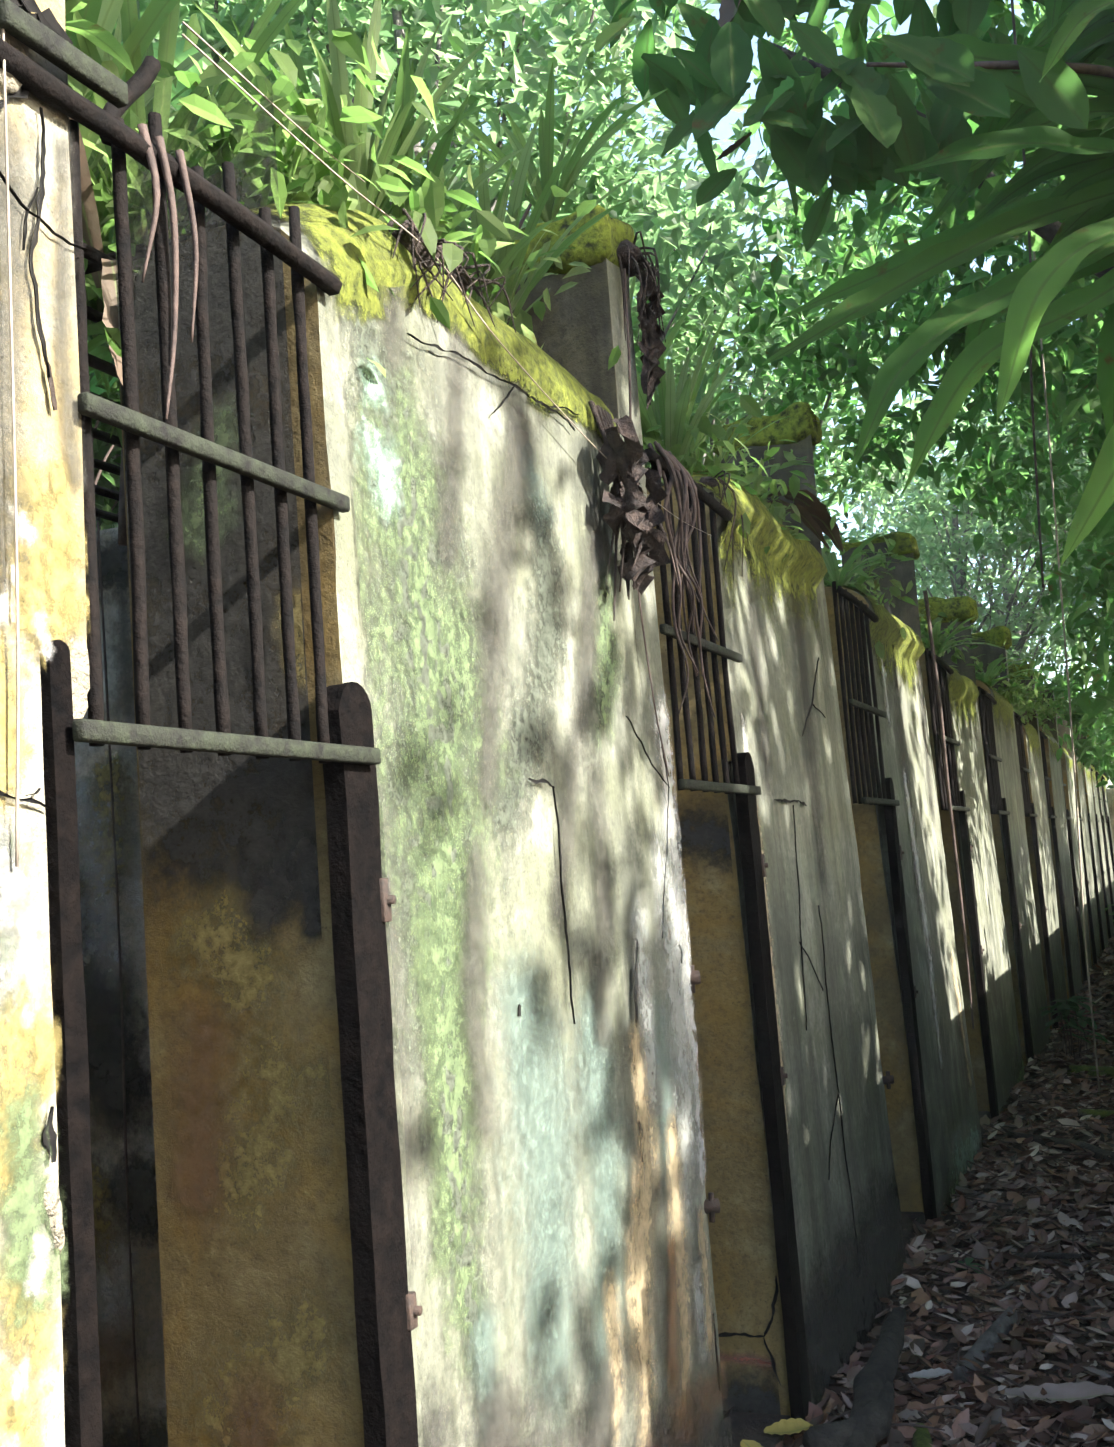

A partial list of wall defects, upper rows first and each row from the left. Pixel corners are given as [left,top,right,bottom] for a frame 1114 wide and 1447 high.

leakage [0,117,30,595]
crack [0,107,87,411]
leakage [0,828,28,998]
crack [528,778,575,1024]
leakage [354,287,784,1447]
crack [712,1276,781,1385]